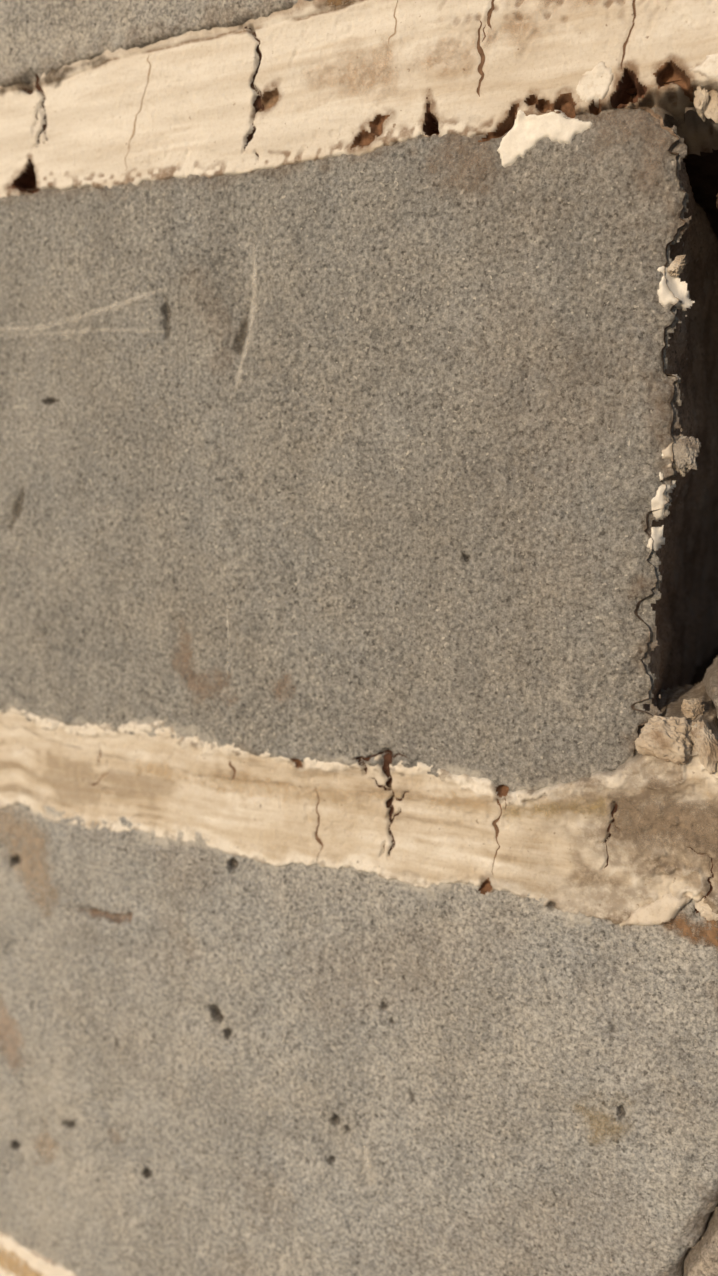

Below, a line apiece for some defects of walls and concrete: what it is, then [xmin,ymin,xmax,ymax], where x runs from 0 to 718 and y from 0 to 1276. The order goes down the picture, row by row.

crack [477,0,494,97]
crack [621,0,636,69]
crack [21,74,48,147]
crack [244,26,264,158]
spalling [369,114,390,137]
peeling [497,61,614,168]
peeling [688,53,718,124]
peeling [691,720,718,775]
crack [353,750,407,857]
crack [492,797,507,874]
crack [603,803,620,868]
peeling [620,893,718,926]